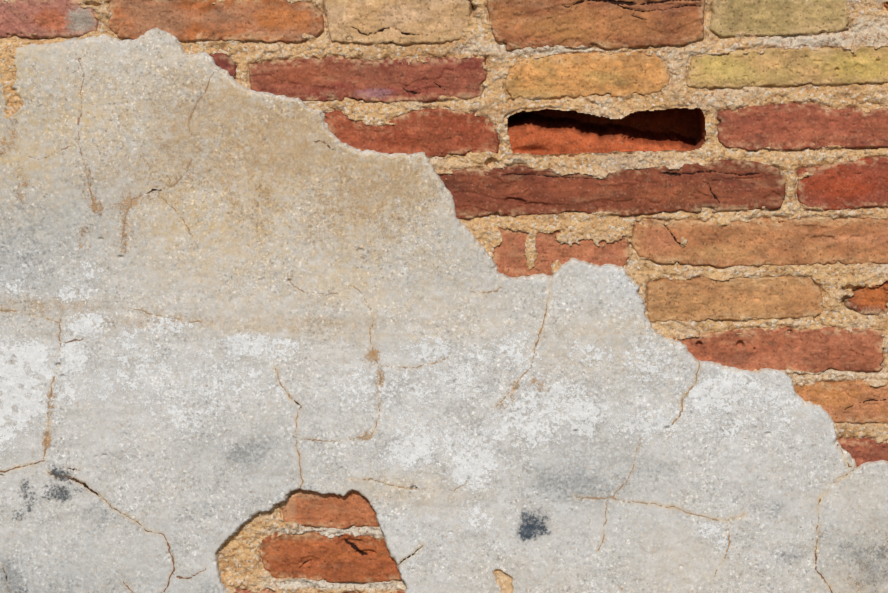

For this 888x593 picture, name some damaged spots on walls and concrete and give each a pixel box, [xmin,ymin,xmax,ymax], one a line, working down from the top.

spalling [0,47,24,119]
peeling [89,28,888,540]
peeling [0,254,305,467]
crack [275,277,449,490]
crack [496,304,547,407]
crack [671,360,700,430]
crack [0,376,204,592]
spalling [214,489,408,593]
crack [345,539,372,555]
leakage [516,511,550,541]
crack [579,444,731,577]
crack [815,499,832,593]